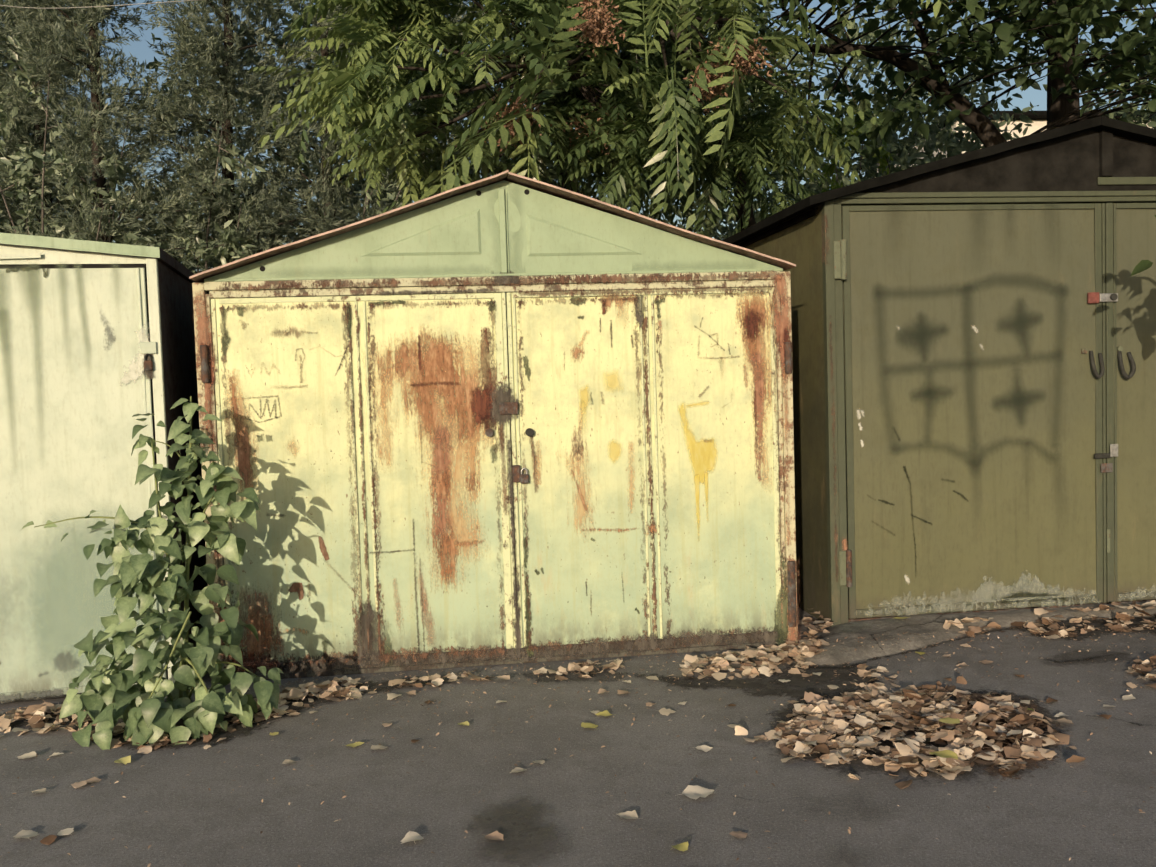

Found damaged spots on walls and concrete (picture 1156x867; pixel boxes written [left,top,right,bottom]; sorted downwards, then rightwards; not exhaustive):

corrosion [195,270,799,673]
peeling [1000,592,1073,604]